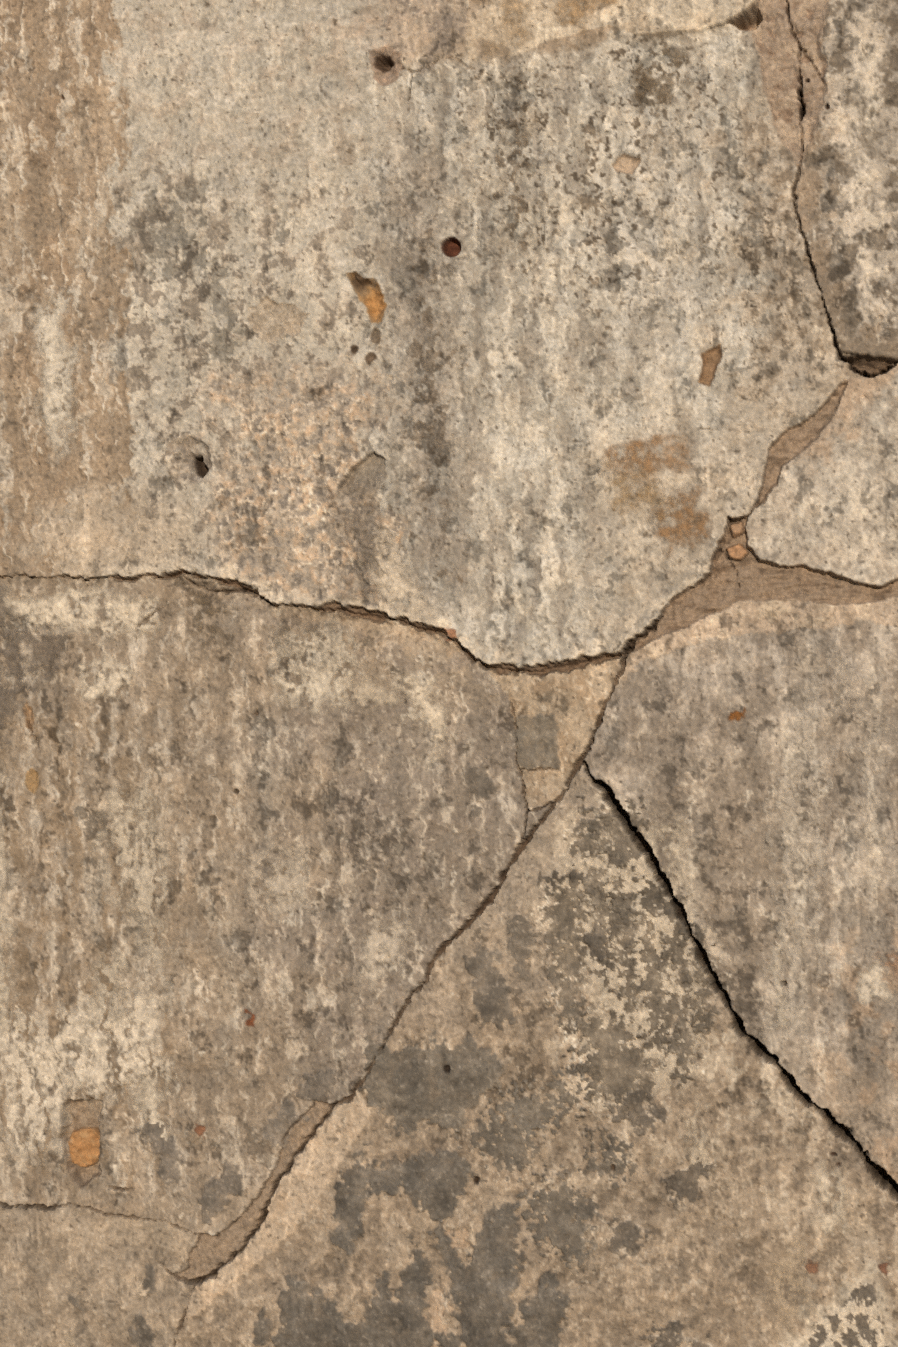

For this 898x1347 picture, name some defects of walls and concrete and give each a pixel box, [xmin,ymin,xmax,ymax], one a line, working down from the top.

crack [399,56,476,102]
crack [785,0,898,379]
peeling [464,755,500,819]
crack [0,503,898,1347]
peeling [253,790,730,1347]
spalling [59,1095,105,1190]
peeling [135,1122,186,1185]
peeling [143,1264,156,1295]
peeling [129,1315,156,1347]